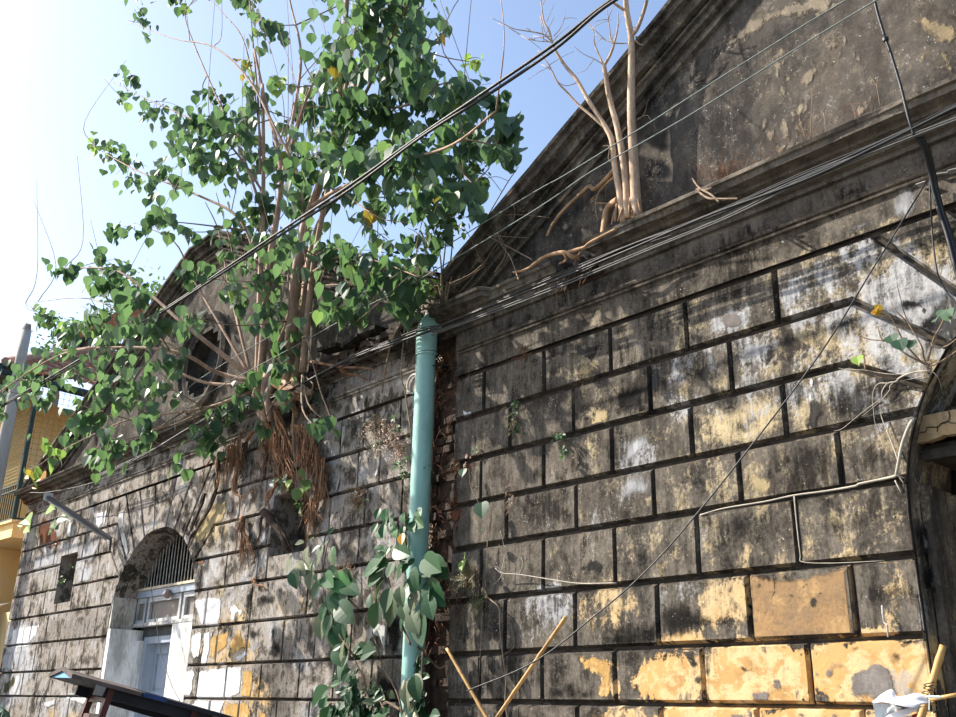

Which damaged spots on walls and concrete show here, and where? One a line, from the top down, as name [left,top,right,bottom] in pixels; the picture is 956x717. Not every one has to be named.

flaking render [725,0,837,45]
damp [591,306,603,327]
damp [902,300,935,329]
damp [617,388,643,414]
damp [806,401,821,427]
crack [918,411,956,434]
damp [627,438,646,459]
damp [624,478,645,496]
damp [582,556,604,574]
peeling [189,632,224,671]